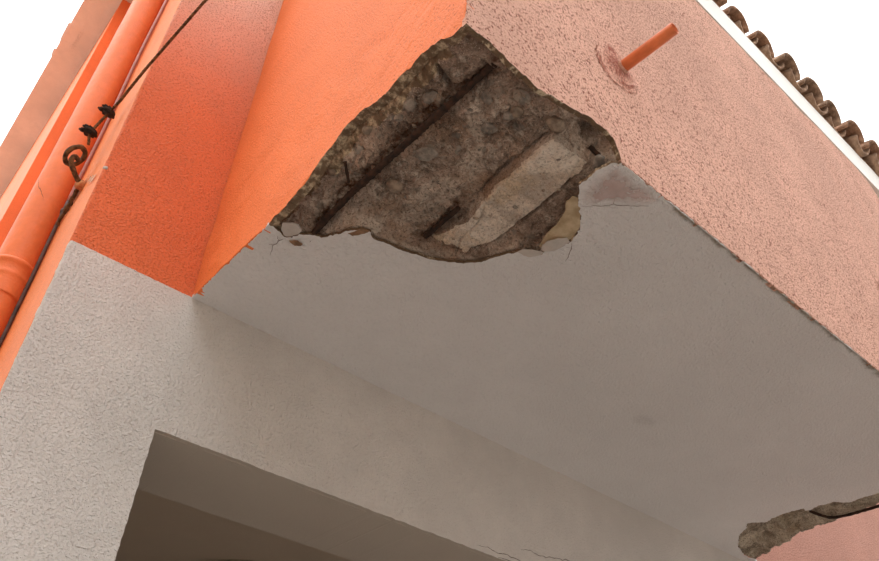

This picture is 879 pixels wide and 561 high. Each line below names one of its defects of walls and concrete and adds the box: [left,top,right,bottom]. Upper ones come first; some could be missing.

spalling [277,33,616,261]
spalling [738,493,879,559]